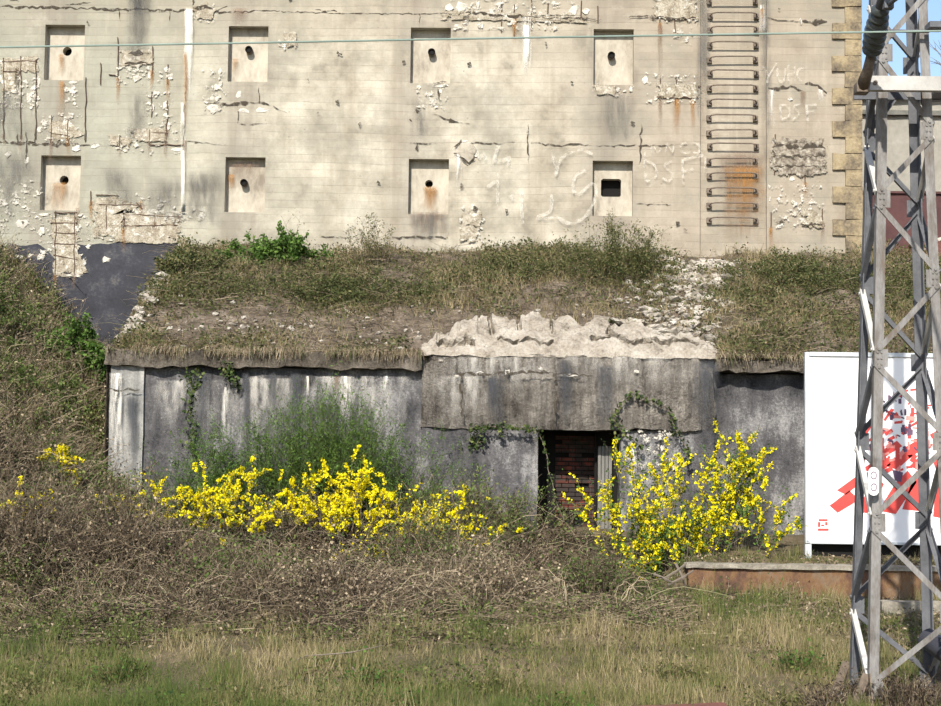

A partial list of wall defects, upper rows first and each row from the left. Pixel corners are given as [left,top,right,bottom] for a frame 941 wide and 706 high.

crack [0,0,438,24]
spalling [440,0,599,35]
spalling [629,0,699,46]
spalling [0,55,87,148]
spalling [100,37,186,155]
rust [728,154,757,200]
spalling [768,134,828,233]
peeling [0,180,206,348]
spalling [421,311,717,362]
leakage [113,373,137,443]
leakage [235,374,276,413]
leakage [292,375,309,417]